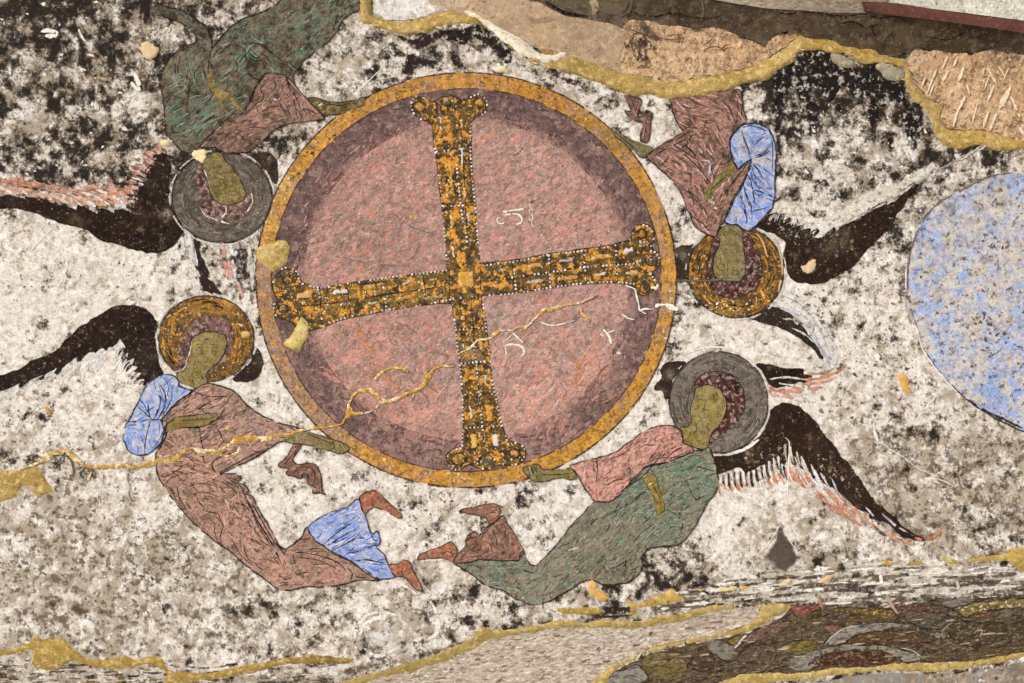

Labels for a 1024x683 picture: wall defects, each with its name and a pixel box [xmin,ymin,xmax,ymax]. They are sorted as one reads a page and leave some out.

flaking render [373,0,801,82]
leakage [772,50,923,161]
flaking render [907,48,1024,141]
crack [20,273,746,502]
flaking render [361,606,760,683]
flaking render [818,662,1024,683]